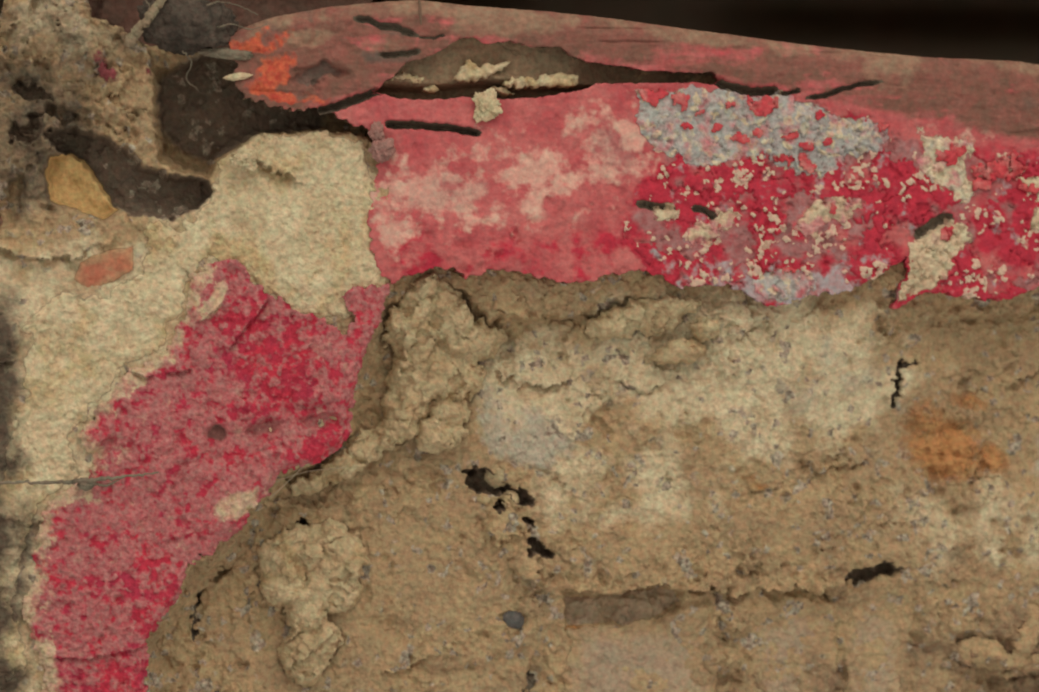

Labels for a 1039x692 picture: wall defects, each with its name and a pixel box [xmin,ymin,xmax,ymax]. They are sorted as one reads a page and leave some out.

crack [317,15,884,137]
peeling [635,84,890,178]
peeling [652,203,680,221]
peeling [687,210,742,245]
peeling [752,267,817,303]
peeling [794,197,862,239]
peeling [898,218,972,301]
peeling [915,128,1039,230]
spalling [0,130,390,682]
crack [890,358,918,409]